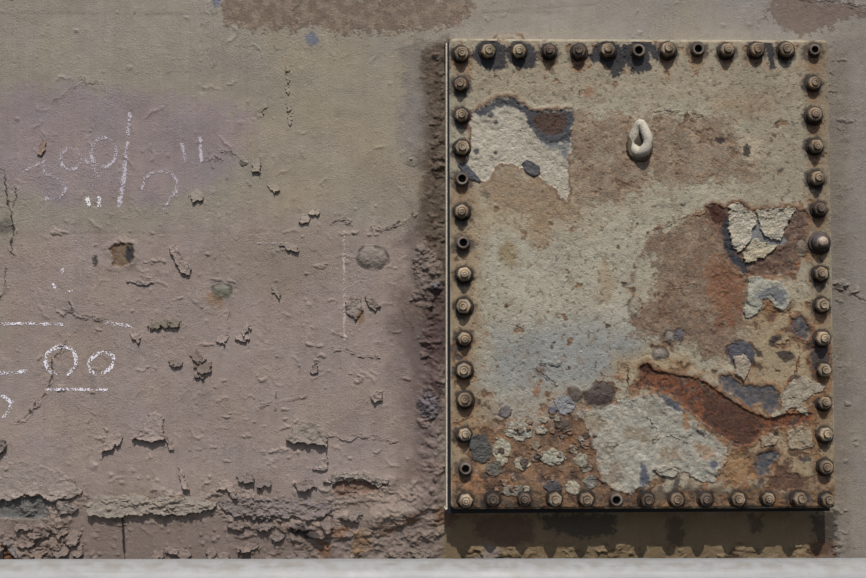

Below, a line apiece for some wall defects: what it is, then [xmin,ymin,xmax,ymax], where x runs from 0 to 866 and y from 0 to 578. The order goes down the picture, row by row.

peeling [457,91,580,201]
crack [0,165,22,305]
peeling [87,235,155,286]
corrosion [452,79,822,505]
peeling [696,193,817,318]
peeling [101,411,174,453]
peeling [0,421,395,559]
peeling [391,546,430,559]
corrosion [304,375,641,559]
peeling [586,364,720,492]